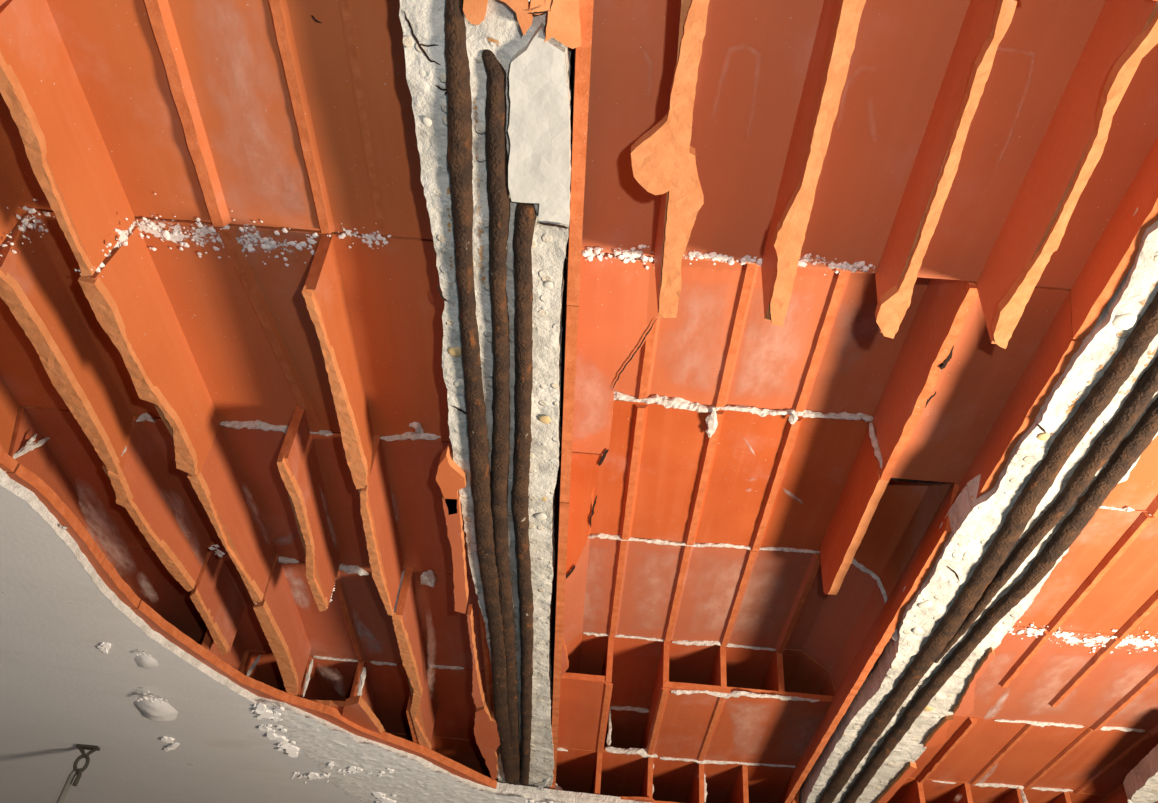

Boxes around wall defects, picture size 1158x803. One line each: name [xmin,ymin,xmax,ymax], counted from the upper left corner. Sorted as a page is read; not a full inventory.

leakage [0,199,55,256]
leakage [75,210,391,278]
leakage [582,244,655,270]
leakage [684,251,762,266]
leakage [798,253,875,275]
spalling [0,0,650,803]
spalling [798,221,1158,803]
leakage [1008,621,1158,654]
leakage [1034,659,1075,713]
leakage [1112,671,1149,712]